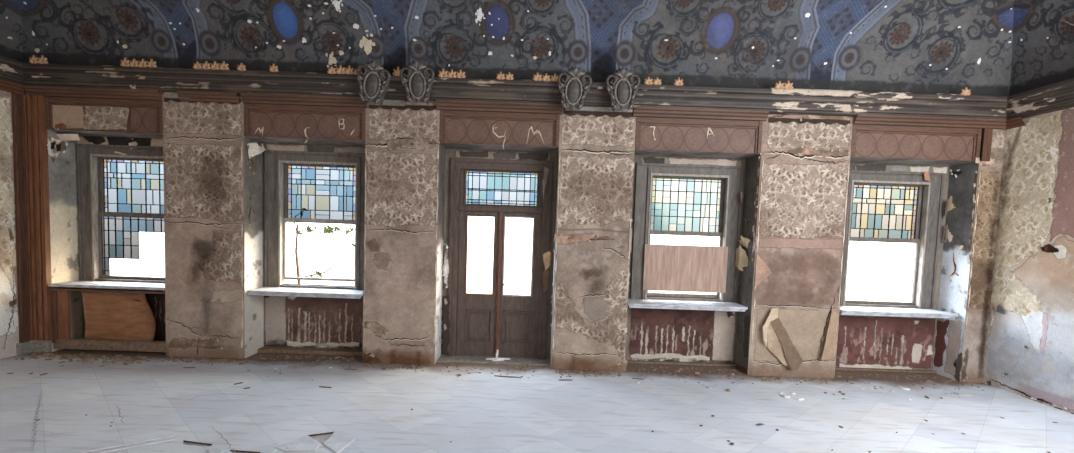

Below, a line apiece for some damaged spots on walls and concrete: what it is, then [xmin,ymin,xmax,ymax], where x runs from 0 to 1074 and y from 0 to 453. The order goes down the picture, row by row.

flaking render [325,15,394,68]
flaking render [475,8,505,40]
peeling [771,88,912,121]
crack [765,151,849,164]
peeling [788,147,962,274]
flaking render [943,156,995,325]
flaking render [0,219,19,336]
flaking render [1013,236,1074,301]
crack [167,319,232,355]
leakage [268,303,361,349]
flaking render [727,289,934,369]
leakage [863,320,905,366]